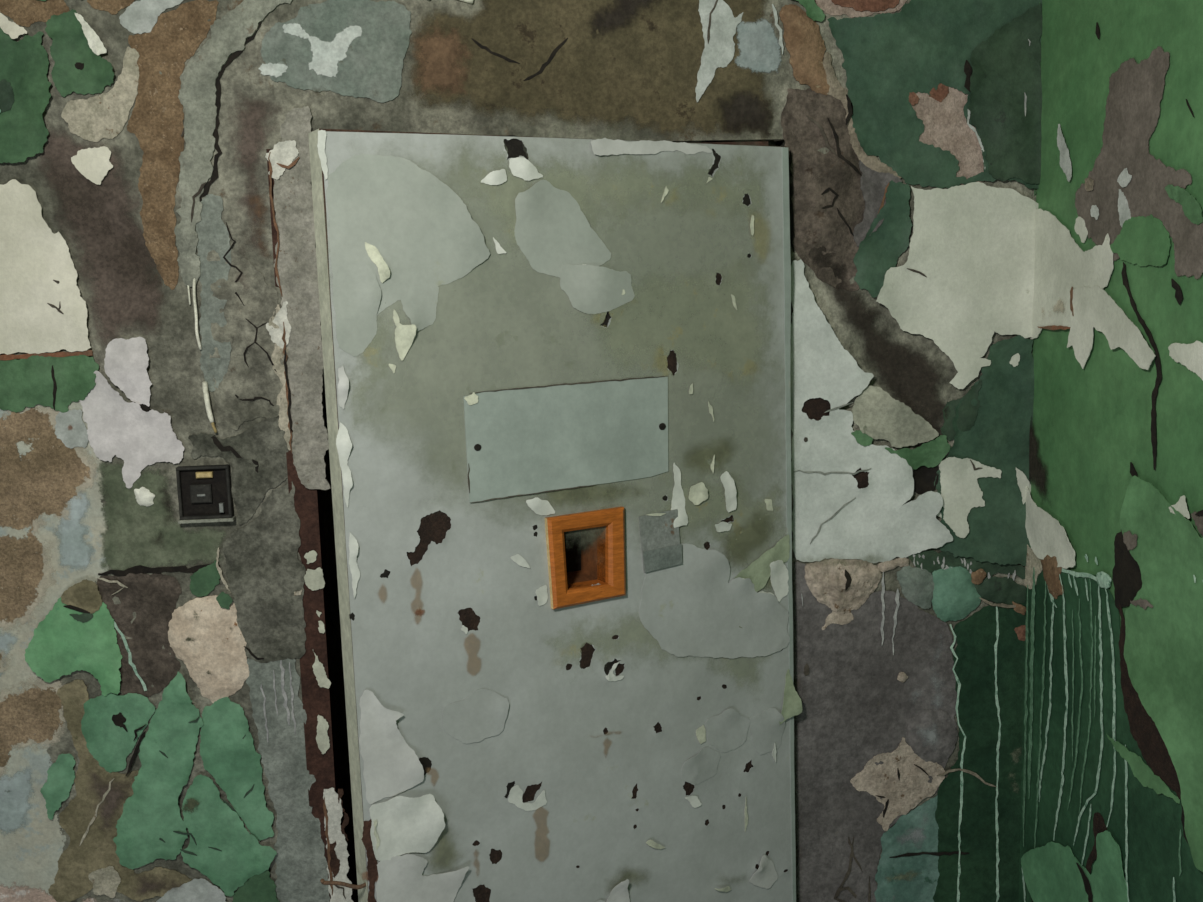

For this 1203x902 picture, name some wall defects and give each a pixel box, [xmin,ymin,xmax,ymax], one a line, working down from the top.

peeling [0,0,135,164]
spalling [127,0,219,290]
crack [191,22,261,222]
damp [411,0,784,135]
peeling [0,106,331,623]
crack [223,222,292,433]
corrosion [407,510,451,566]
damp [813,246,945,446]
flaking render [781,0,1203,902]
crack [1123,262,1162,477]
peeling [0,560,354,902]
crack [1112,531,1188,843]